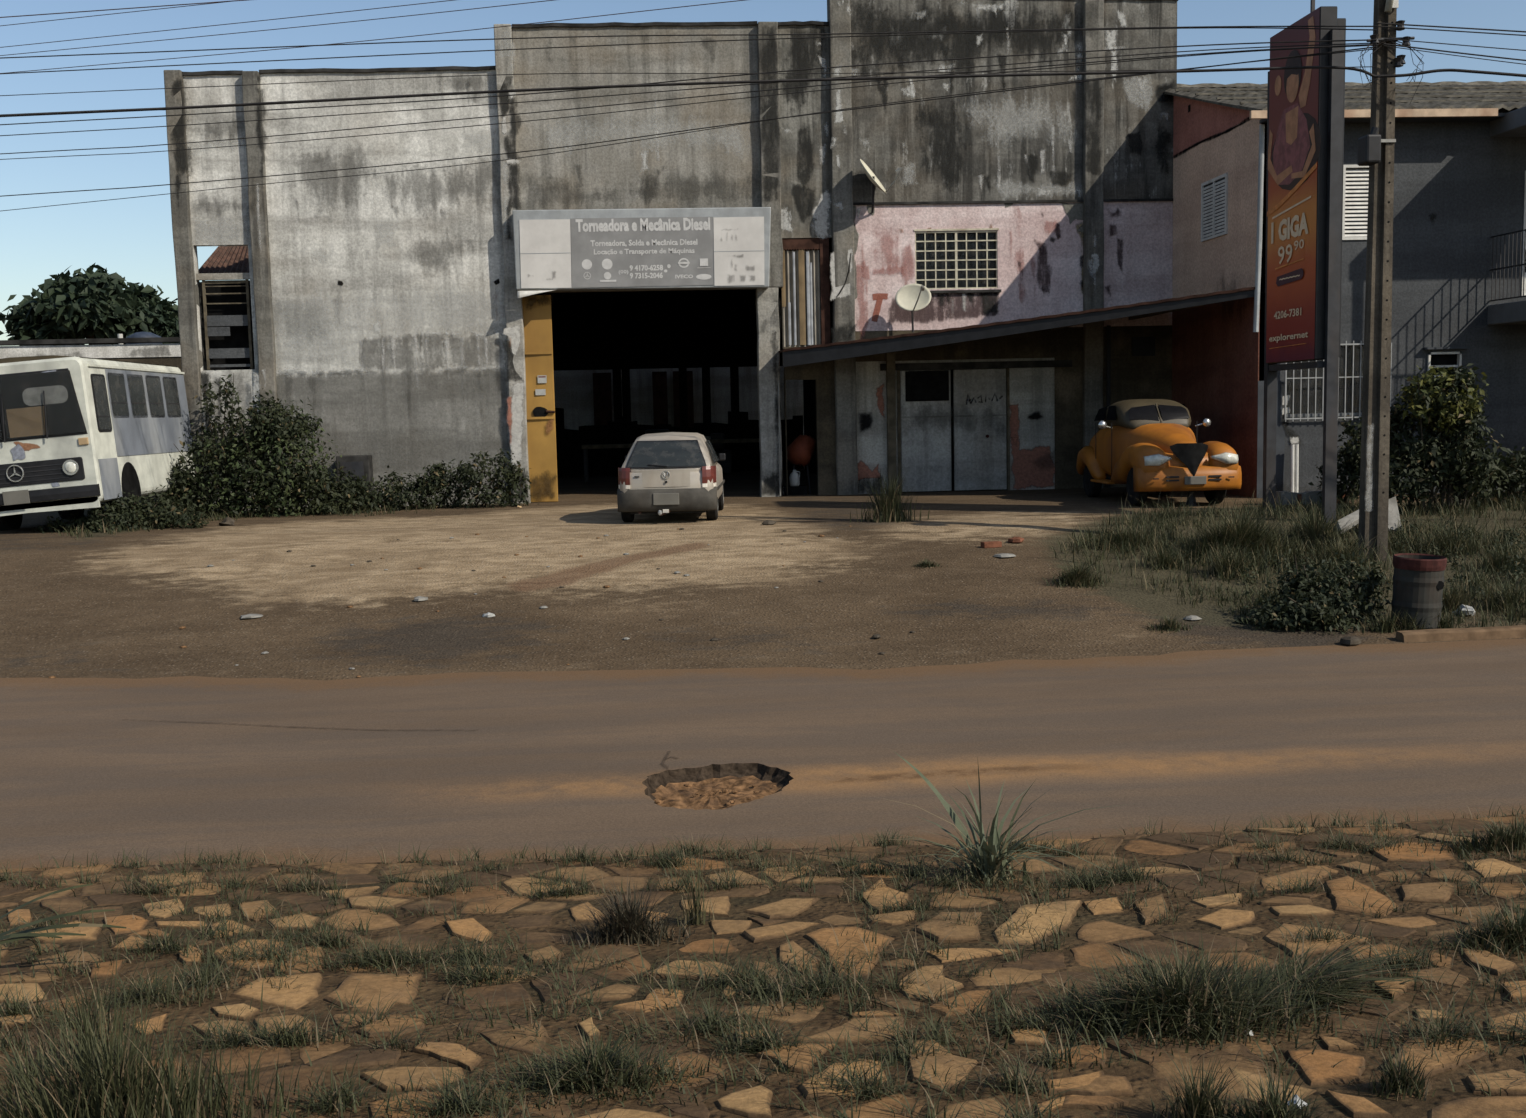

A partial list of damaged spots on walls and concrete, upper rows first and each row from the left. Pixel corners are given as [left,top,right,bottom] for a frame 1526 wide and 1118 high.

damp [172,80,193,198]
damp [760,25,843,238]
damp [848,0,1126,196]
damp [1128,79,1171,174]
damp [478,332,522,381]